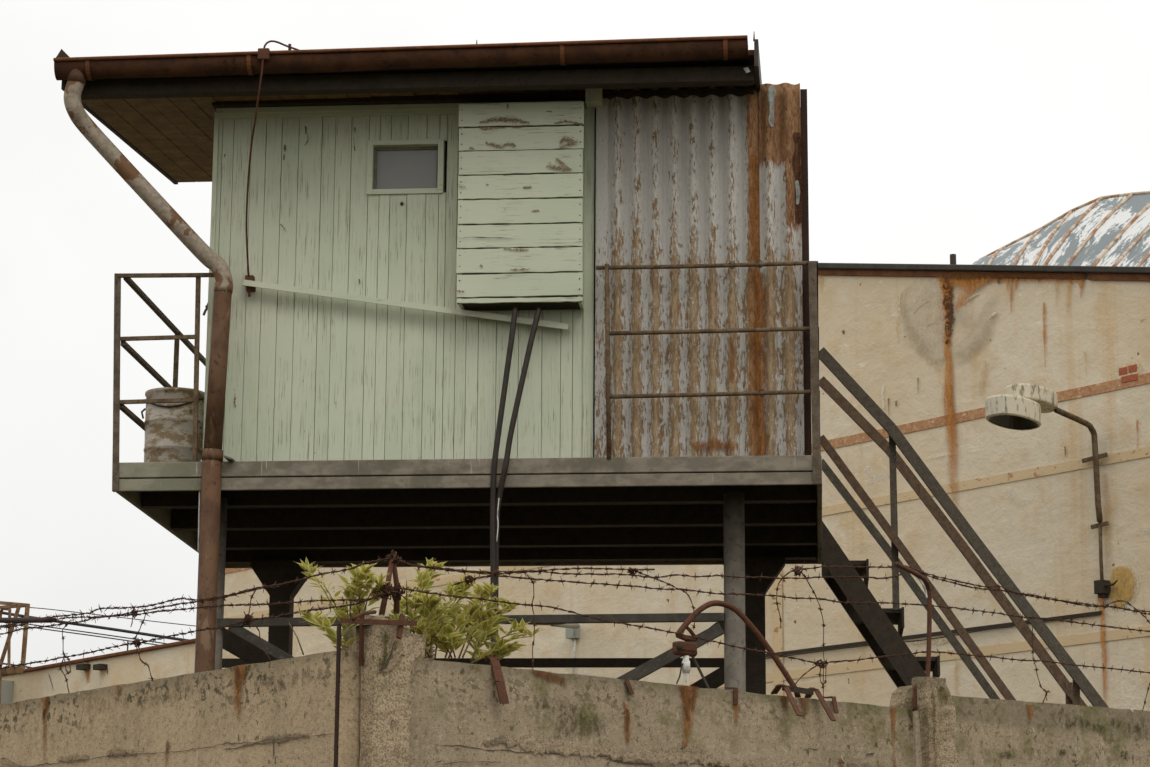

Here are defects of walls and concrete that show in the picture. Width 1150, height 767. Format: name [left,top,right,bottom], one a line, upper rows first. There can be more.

peeling [546,111,582,173]
rust [792,132,804,224]
rust [751,155,767,456]
rust [939,273,1084,483]
rust [693,440,735,451]
rust [234,664,250,712]
rust [680,685,698,747]
crack [0,733,333,767]
crack [436,744,728,767]